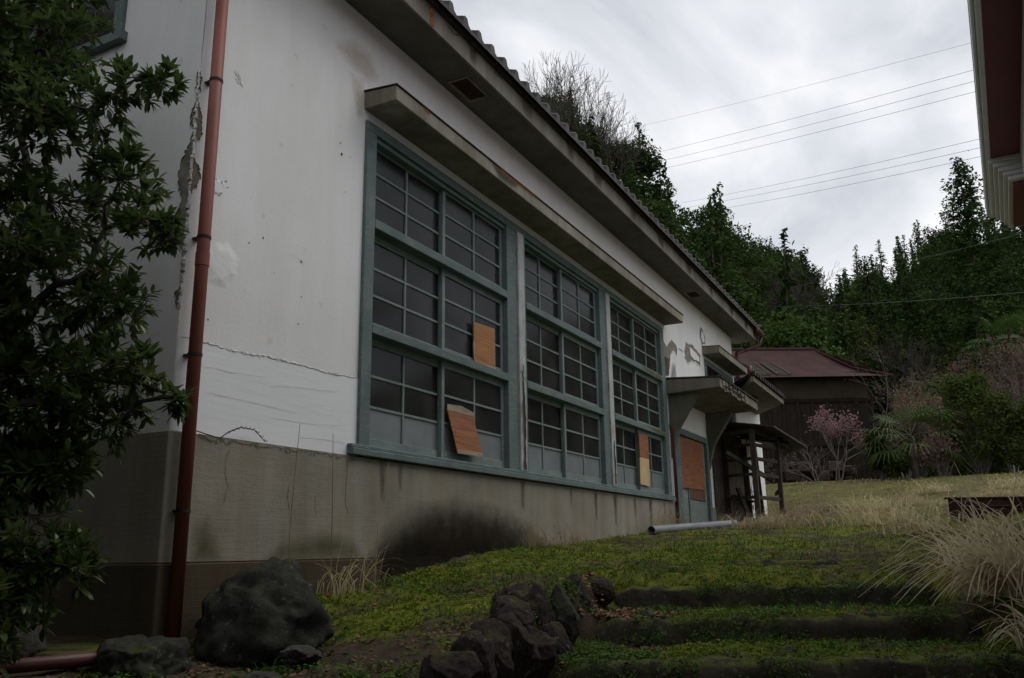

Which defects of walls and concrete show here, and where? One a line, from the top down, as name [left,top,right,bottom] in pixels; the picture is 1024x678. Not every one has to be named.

flaking render [174,70,203,309]
crack [180,336,358,511]
flaking render [663,326,705,377]